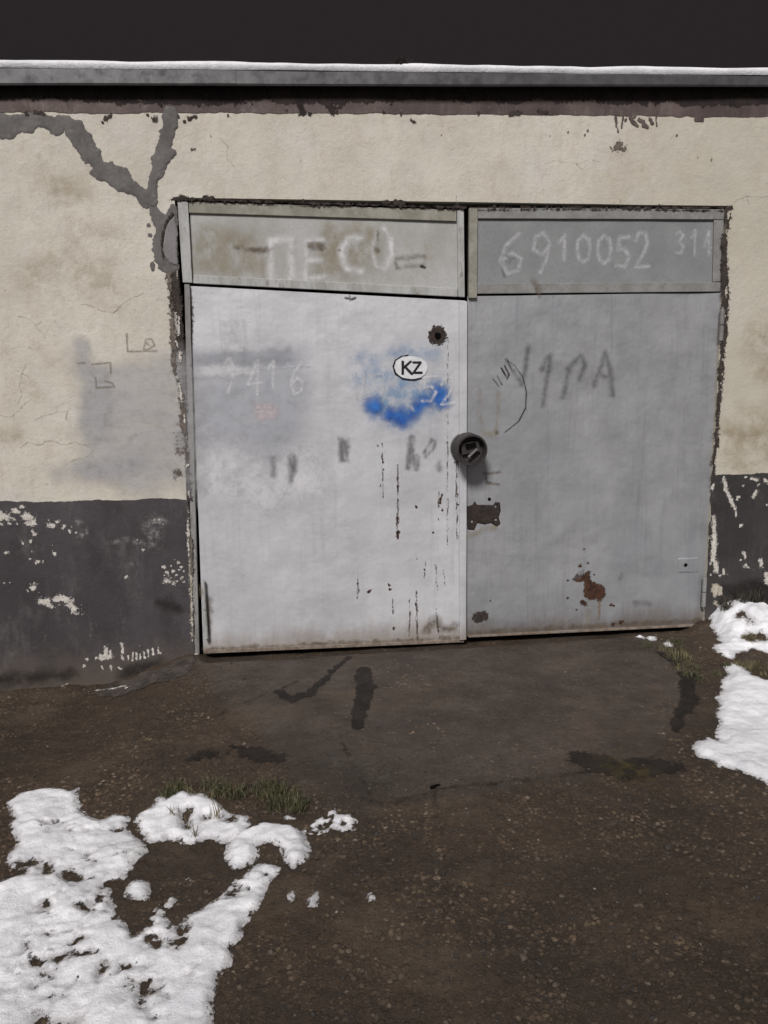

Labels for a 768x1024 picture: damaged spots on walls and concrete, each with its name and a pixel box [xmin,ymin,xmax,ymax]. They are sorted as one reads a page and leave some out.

crack [0,105,179,273]
flaking render [171,194,768,528]
flaking render [161,271,198,655]
corrosion [437,433,459,545]
peeling [0,505,77,565]
peeling [27,582,84,615]
corrosion [393,591,423,642]
corrosion [436,600,516,640]
corrosion [566,548,615,611]
peeling [710,505,725,607]
peeling [740,551,768,585]
peeling [83,642,162,672]